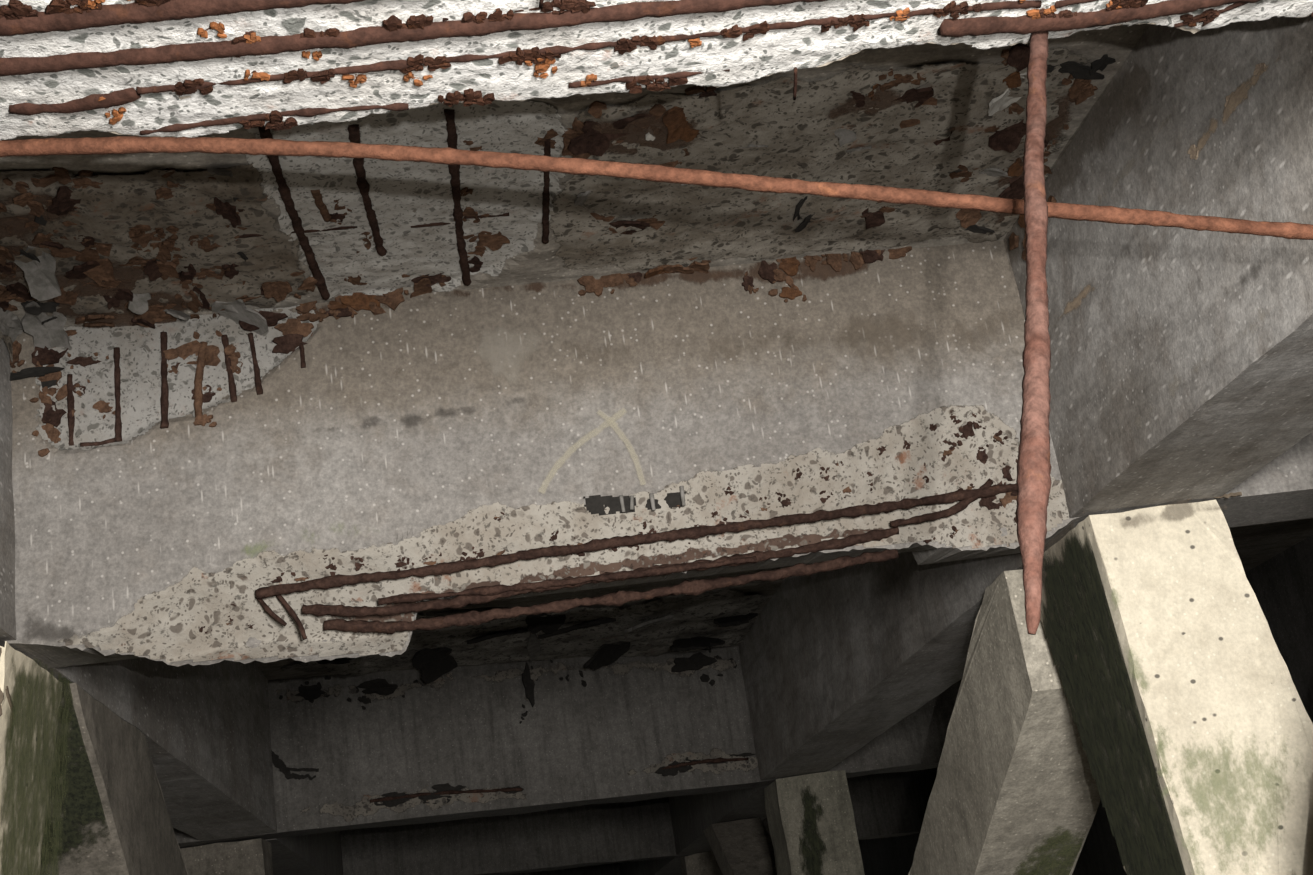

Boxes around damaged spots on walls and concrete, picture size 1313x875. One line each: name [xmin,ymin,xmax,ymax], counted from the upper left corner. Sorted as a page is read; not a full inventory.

corrosion [296,273,470,322]
spalling [0,0,1313,635]
corrosion [577,246,912,303]
spalling [58,405,1020,710]
crack [0,686,13,716]